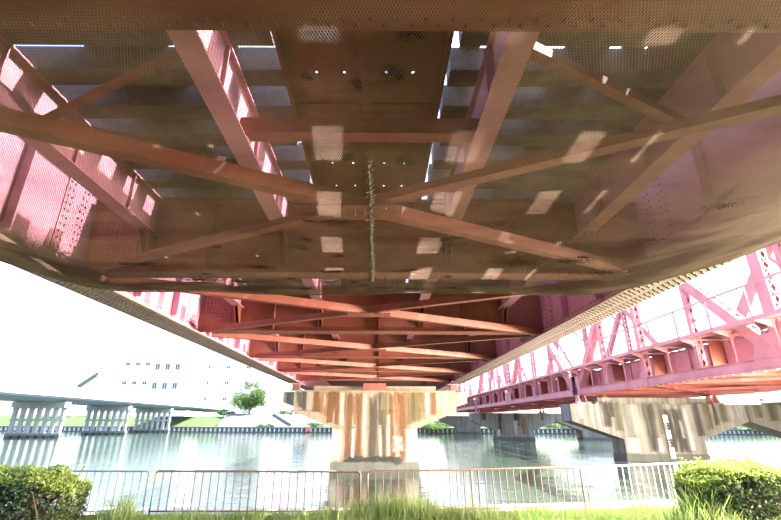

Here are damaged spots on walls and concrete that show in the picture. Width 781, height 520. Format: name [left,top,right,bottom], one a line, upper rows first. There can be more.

rust [313,391,362,458]
leakage [363,393,389,458]
rust [389,393,421,459]
leakage [408,393,439,461]
leakage [628,406,640,453]
leakage [644,402,739,452]